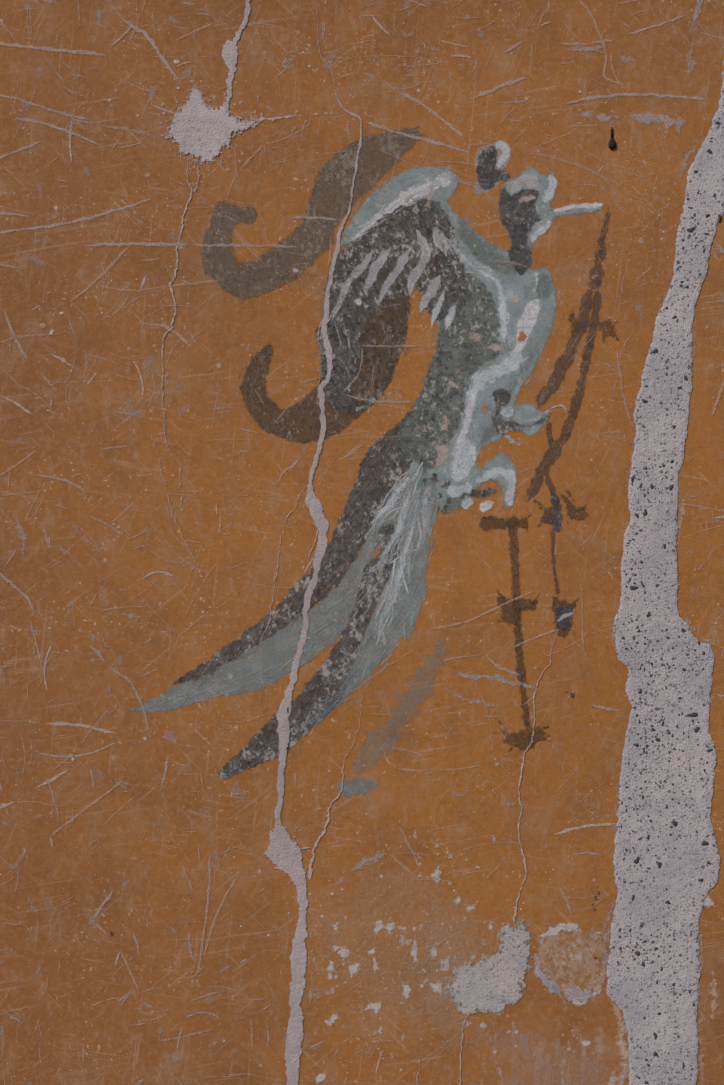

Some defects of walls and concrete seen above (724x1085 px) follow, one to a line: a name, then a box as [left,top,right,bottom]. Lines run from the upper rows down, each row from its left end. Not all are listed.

crack [222,0,251,109]
crack [151,164,201,574]
crack [260,7,363,1085]
crack [603,61,724,1085]
peeling [327,940,359,994]
spalling [374,918,607,1024]